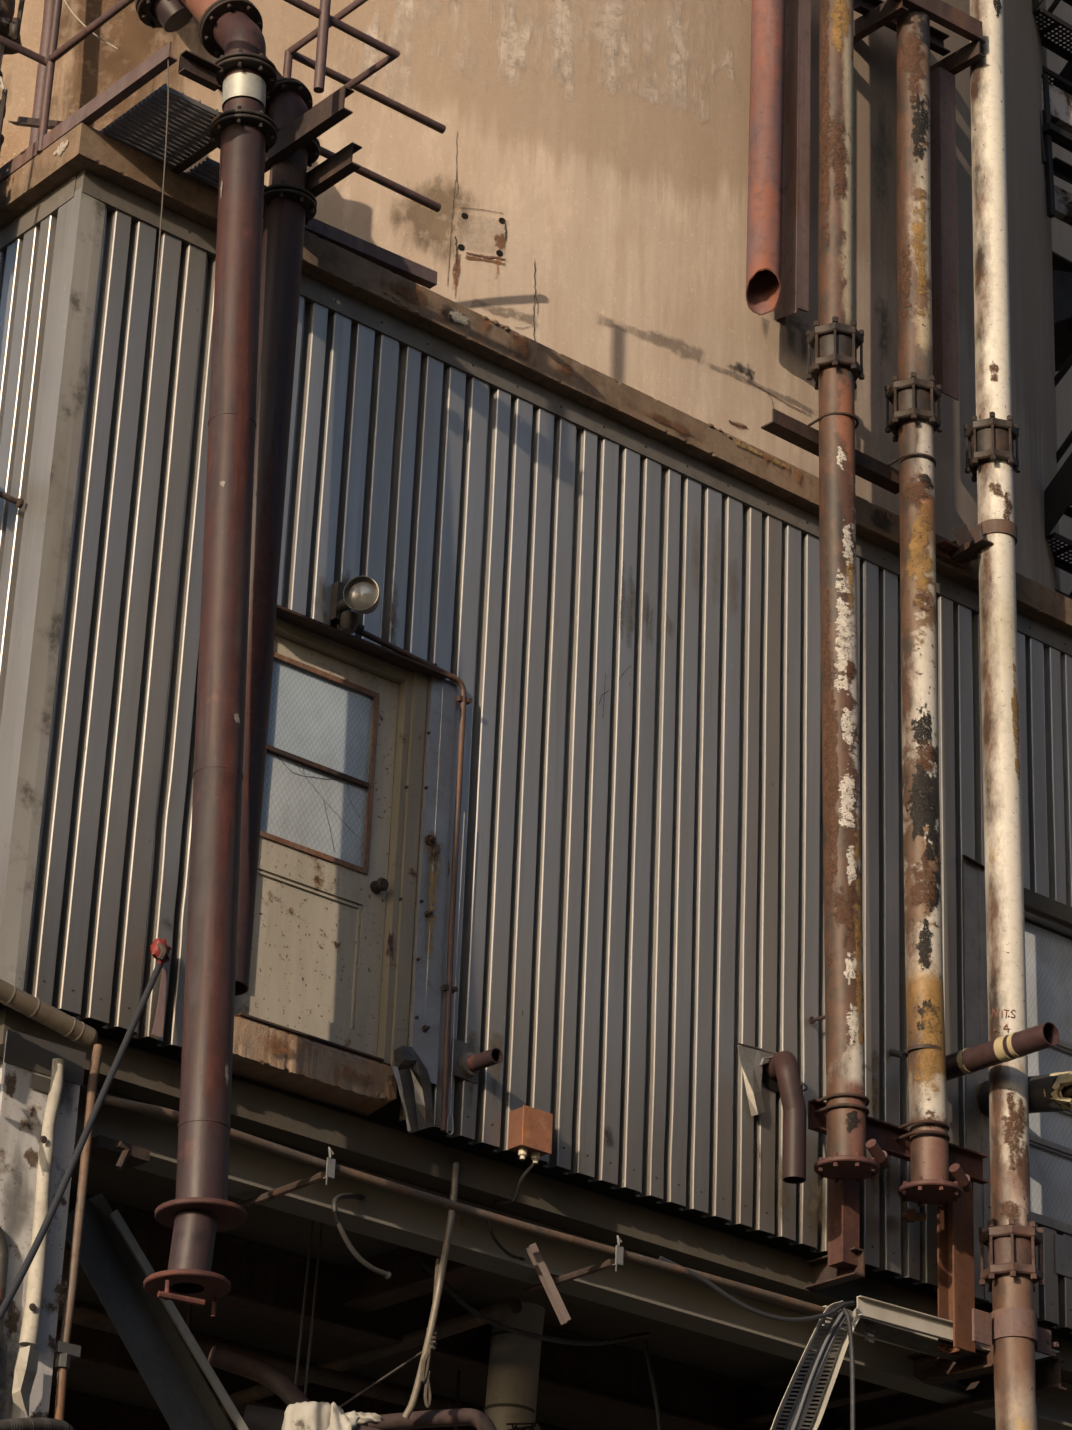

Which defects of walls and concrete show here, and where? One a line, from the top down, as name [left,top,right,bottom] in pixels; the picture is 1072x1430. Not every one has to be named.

leakage [640,332,812,413]
rust [421,832,450,961]